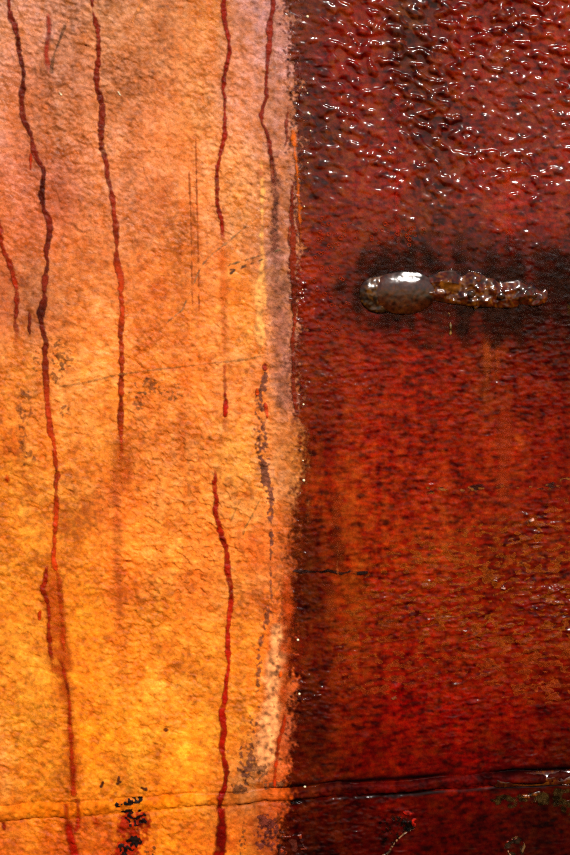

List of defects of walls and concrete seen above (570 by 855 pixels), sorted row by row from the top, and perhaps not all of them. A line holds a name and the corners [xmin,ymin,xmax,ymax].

corrosion [90,0,125,447]
corrosion [215,0,232,235]
corrosion [259,0,276,166]
corrosion [0,0,80,855]
corrosion [212,473,234,855]